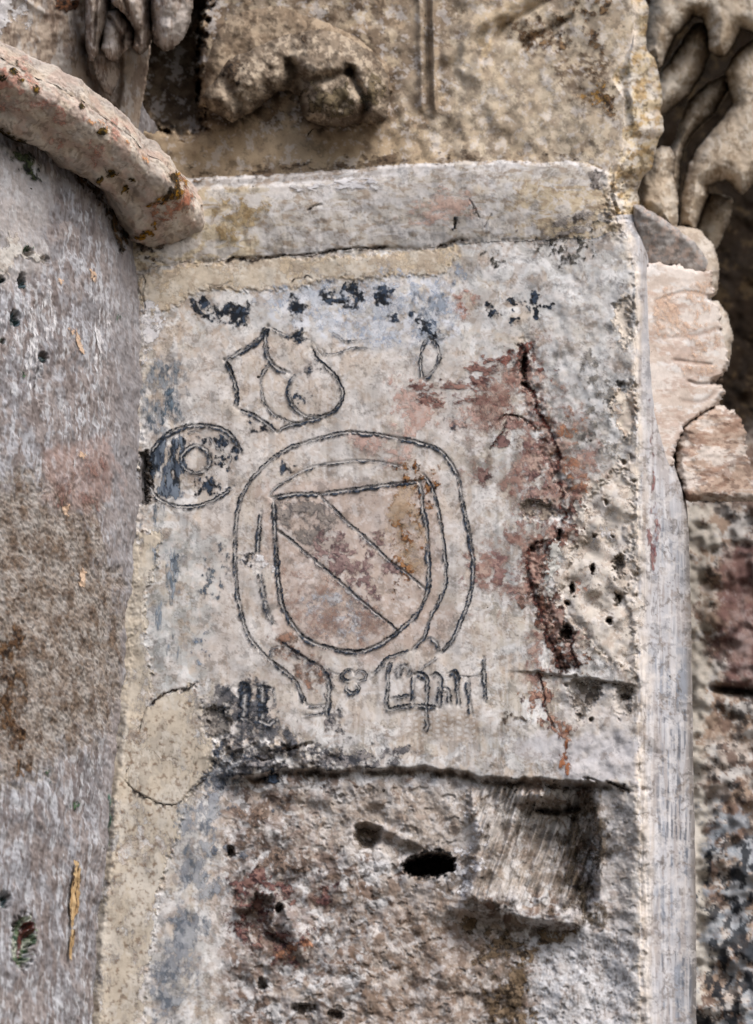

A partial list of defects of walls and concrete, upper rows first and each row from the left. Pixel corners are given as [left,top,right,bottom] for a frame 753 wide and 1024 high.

crack [438,202,486,248]
crack [209,246,386,288]
crack [492,346,578,726]
crack [140,683,195,729]
crack [126,769,208,806]
crack [588,778,631,793]